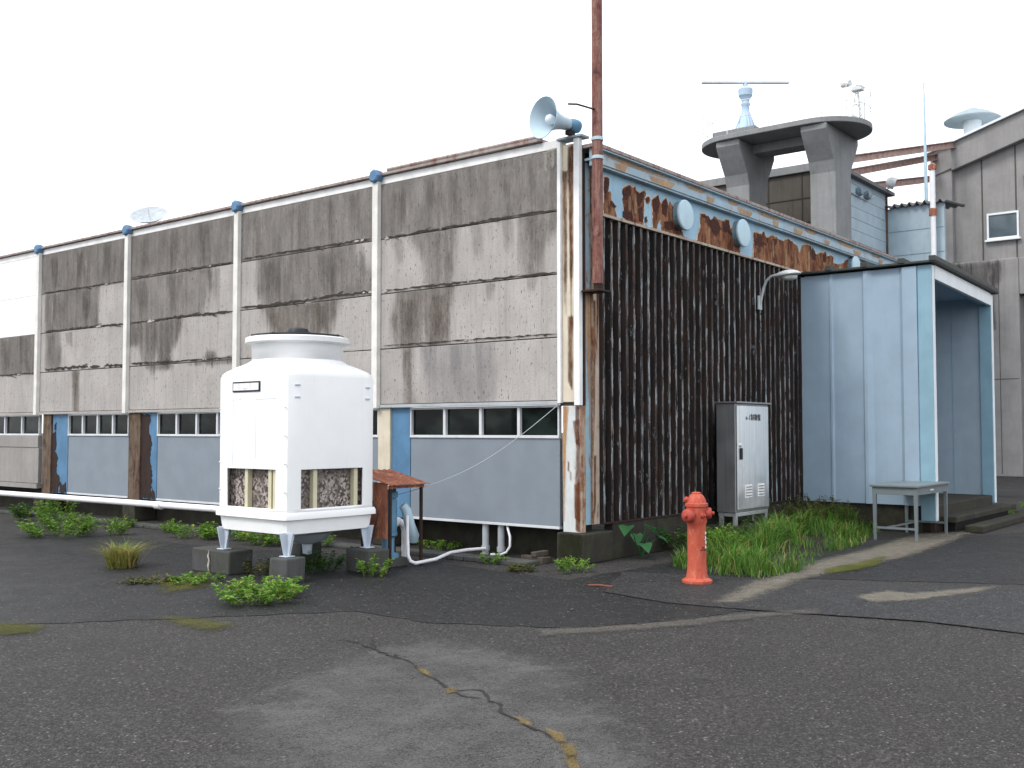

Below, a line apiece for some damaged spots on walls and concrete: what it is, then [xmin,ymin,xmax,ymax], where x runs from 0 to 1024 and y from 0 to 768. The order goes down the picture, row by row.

leakage [43,217,243,339]
leakage [248,200,370,335]
corrosion [563,146,573,284]
corrosion [603,155,883,272]
corrosion [563,288,599,532]
crack [371,639,577,768]